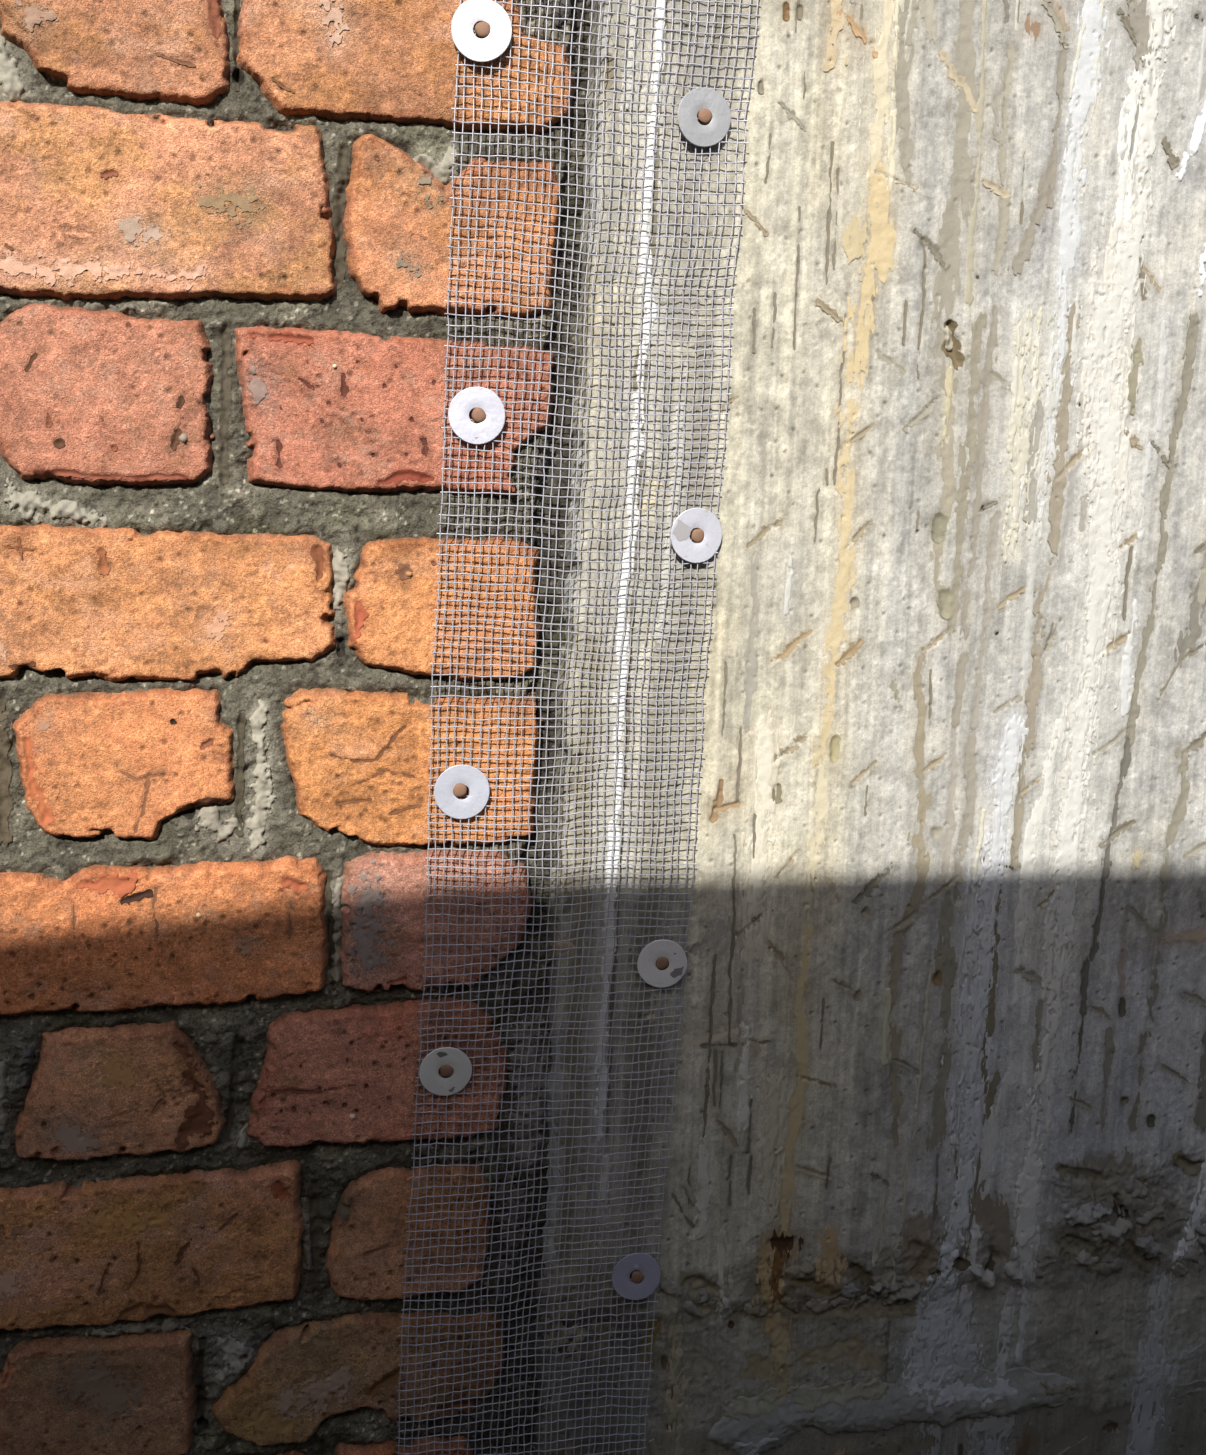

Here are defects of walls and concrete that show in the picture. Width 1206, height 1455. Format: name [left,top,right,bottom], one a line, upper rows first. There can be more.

leakage [685,0,1206,1455]
spalling [1172,1150,1203,1176]
rust [752,1227,848,1336]
spalling [792,1257,875,1301]
spalling [931,1255,995,1278]